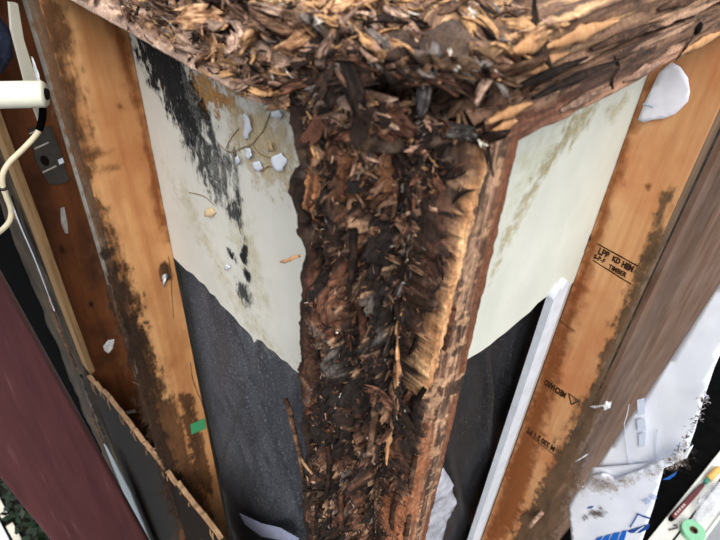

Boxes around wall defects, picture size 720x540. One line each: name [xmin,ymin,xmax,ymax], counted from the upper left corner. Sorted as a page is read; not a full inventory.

water stain [32,0,214,540]
water stain [112,24,292,234]
water stain [226,240,256,308]
peeling [362,351,414,445]
peeling [369,165,420,242]
peeling [384,246,425,355]
water stain [501,107,592,250]
water stain [486,139,674,540]